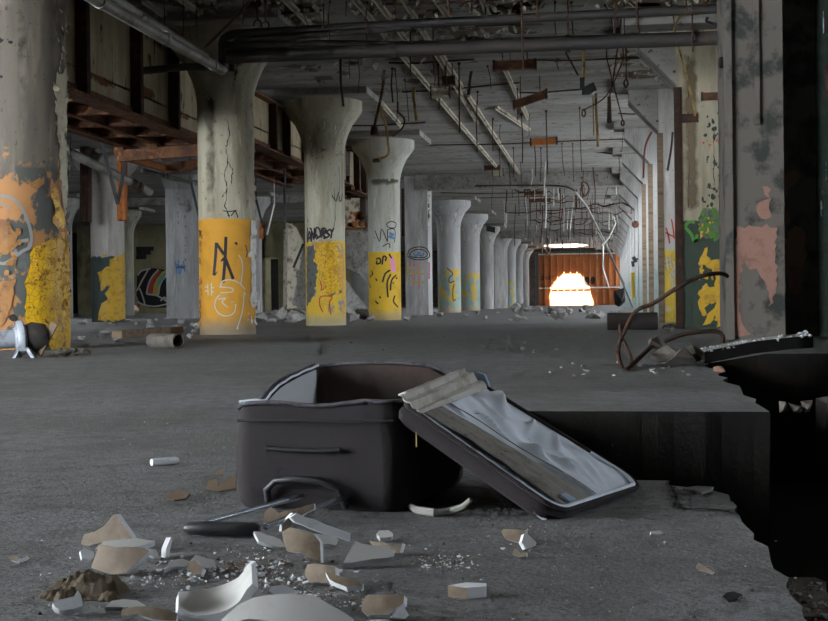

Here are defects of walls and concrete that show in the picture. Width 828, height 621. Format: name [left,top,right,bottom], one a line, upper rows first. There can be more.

peeling [0,23,71,350]
crack [222,120,233,218]
peeling [97,253,126,322]
spalling [136,247,154,259]
peeling [306,240,342,306]
peeling [616,156,812,371]
spalling [723,592,742,602]